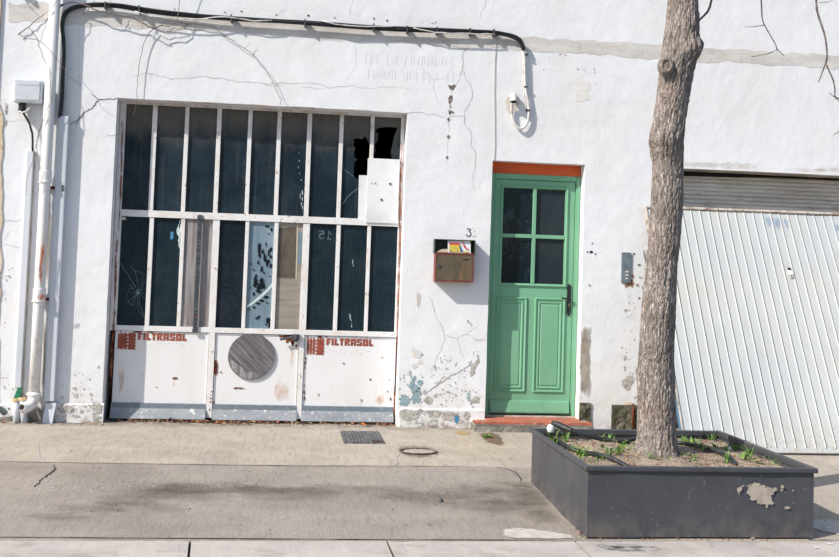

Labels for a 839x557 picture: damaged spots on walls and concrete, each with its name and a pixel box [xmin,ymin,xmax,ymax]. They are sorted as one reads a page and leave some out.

crack [67,32,116,176]
crack [134,38,476,172]
flaking render [624,250,647,320]
peeling [399,348,480,426]
crack [428,296,481,392]
peeling [621,338,637,405]